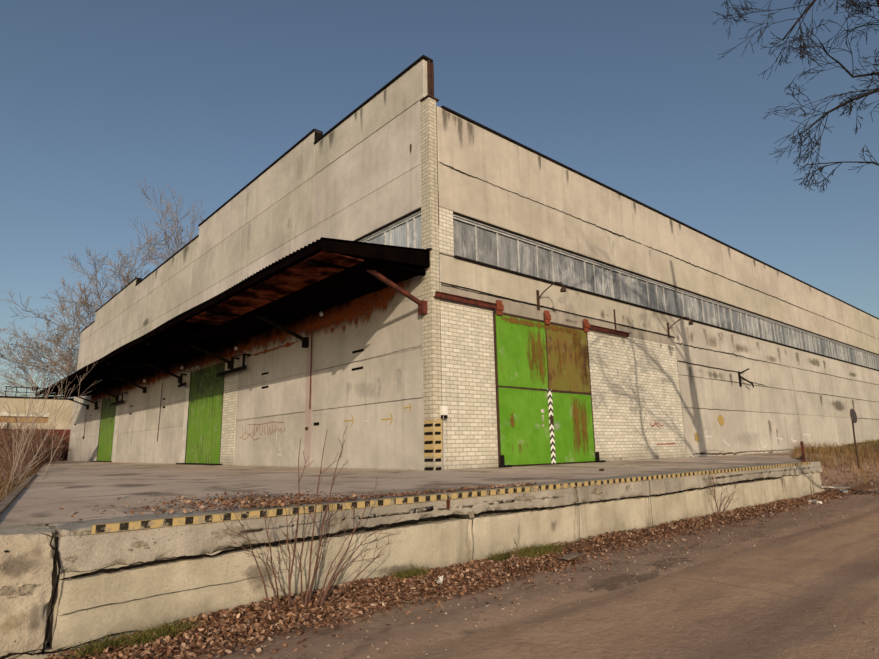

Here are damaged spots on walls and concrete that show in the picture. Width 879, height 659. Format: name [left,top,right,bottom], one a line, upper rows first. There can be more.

rust [91,280,409,401]
rust [501,317,581,382]
rust [573,399,588,451]
crack [587,316,879,461]
crack [0,477,785,659]